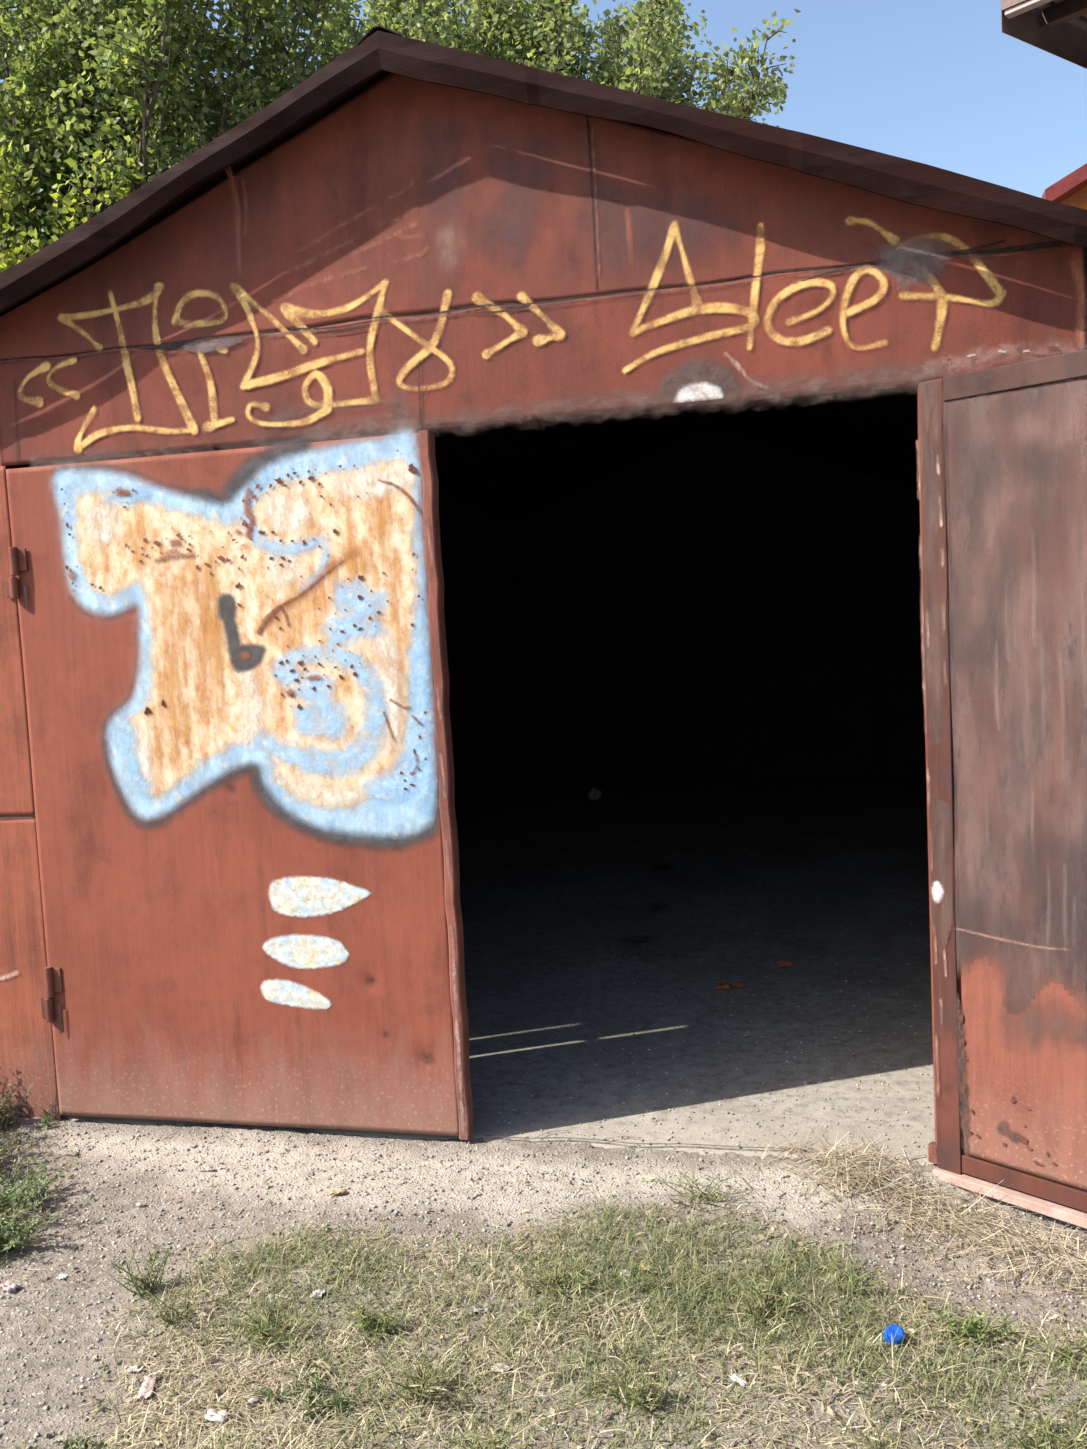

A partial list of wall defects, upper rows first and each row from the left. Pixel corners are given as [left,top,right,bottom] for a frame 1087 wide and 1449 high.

rust [86,486,403,776]